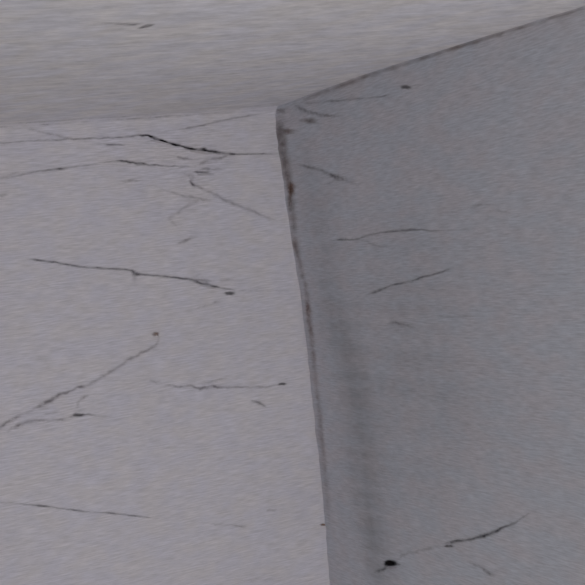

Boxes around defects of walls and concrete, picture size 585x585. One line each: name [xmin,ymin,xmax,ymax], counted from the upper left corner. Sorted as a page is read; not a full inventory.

crack [141,135,235,155]